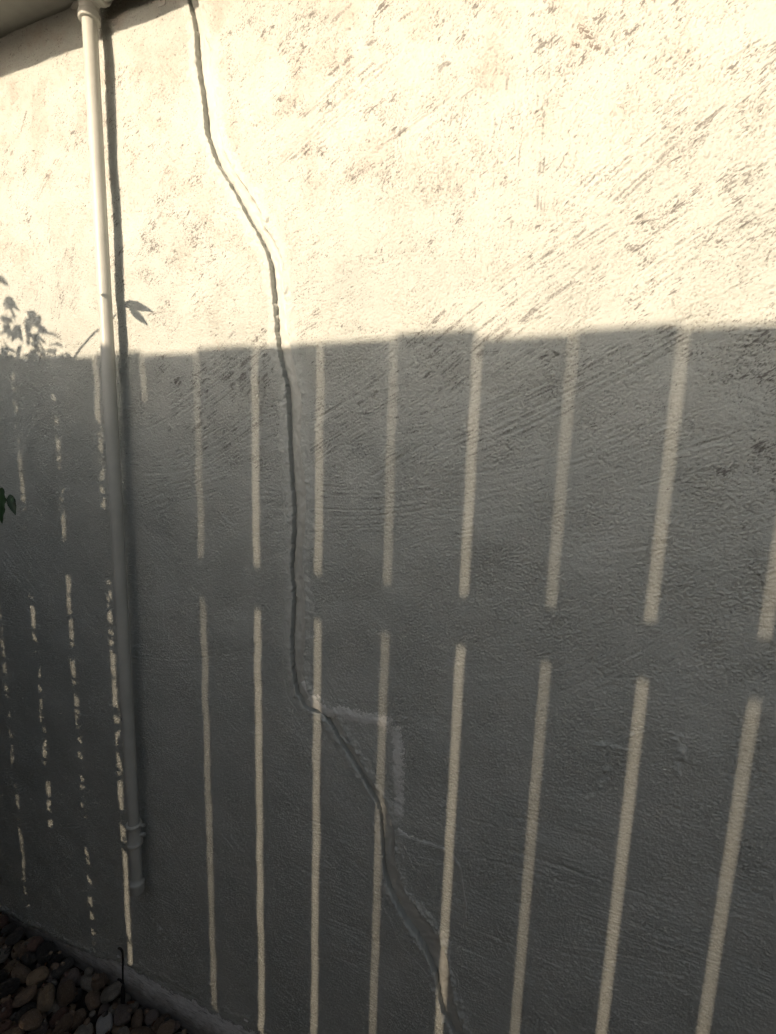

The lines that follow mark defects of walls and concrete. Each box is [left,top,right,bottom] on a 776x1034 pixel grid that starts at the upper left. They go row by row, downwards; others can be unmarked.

crack [176,0,474,1034]